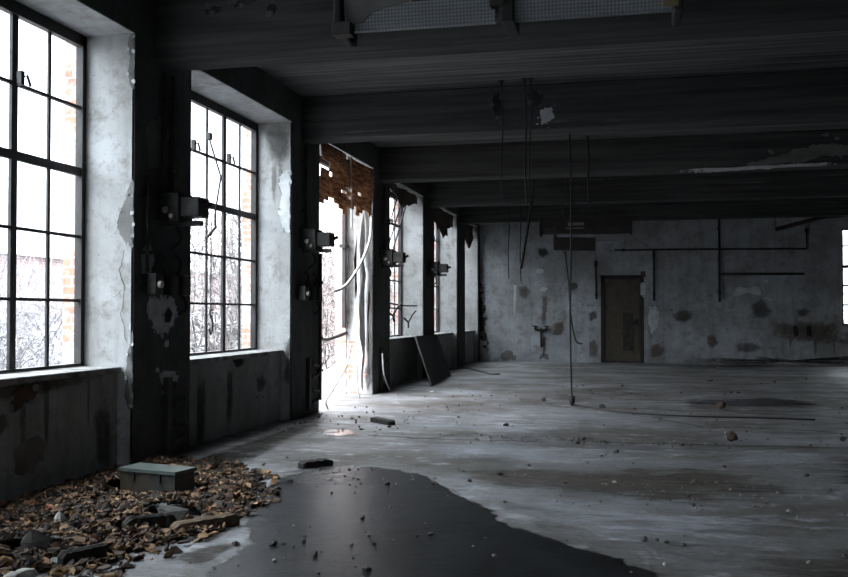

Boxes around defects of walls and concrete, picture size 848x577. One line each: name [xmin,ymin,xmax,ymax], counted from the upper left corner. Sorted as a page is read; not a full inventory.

flaking render [116,180,155,274]
flaking render [277,170,292,233]
peeling [146,295,178,347]